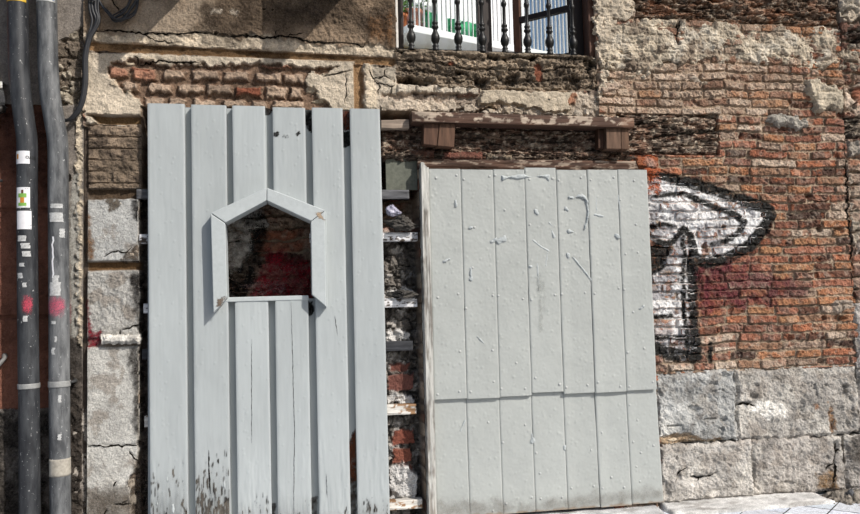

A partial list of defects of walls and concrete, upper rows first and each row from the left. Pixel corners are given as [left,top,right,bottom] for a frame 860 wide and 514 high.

crack [96,0,366,66]
flaking render [109,57,331,110]
crack [88,444,138,461]
crack [826,443,839,484]